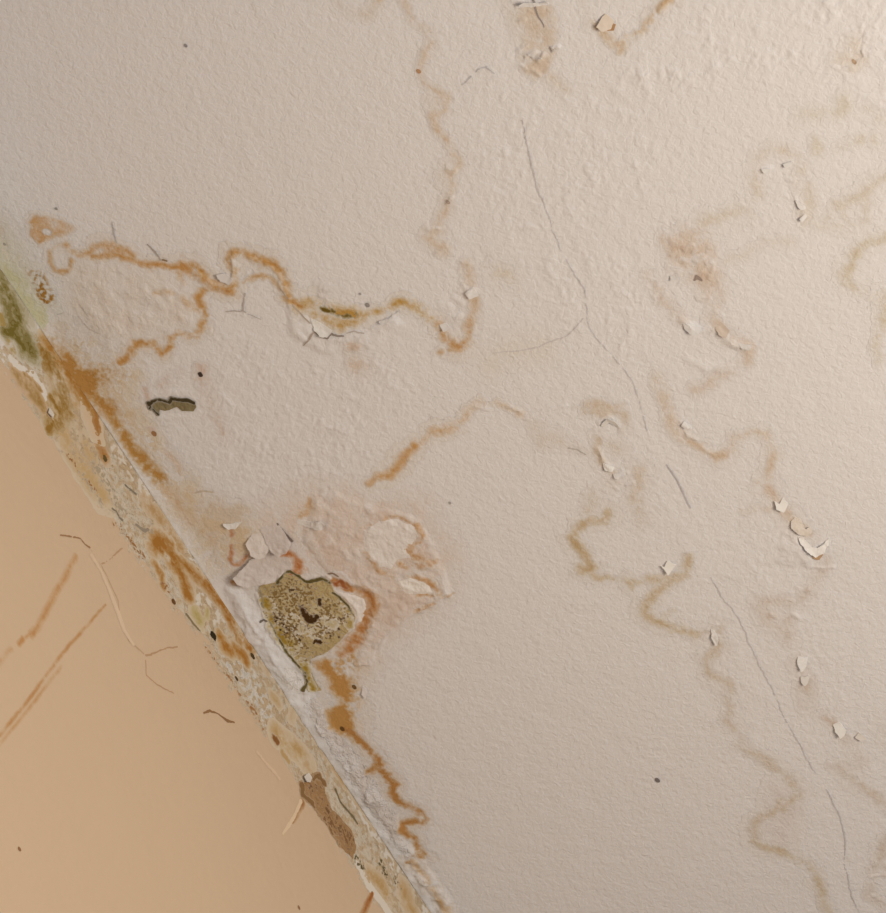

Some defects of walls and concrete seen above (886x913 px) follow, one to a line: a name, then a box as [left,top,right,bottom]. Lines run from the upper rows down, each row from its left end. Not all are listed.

leakage [587,0,686,57]
spalling [153,401,196,416]
flaking render [66,430,190,617]
peeling [775,498,788,513]
peeling [799,538,830,560]
spalling [233,524,355,692]
flaking render [201,624,267,731]
leakage [746,553,886,815]
flaking render [239,660,404,913]